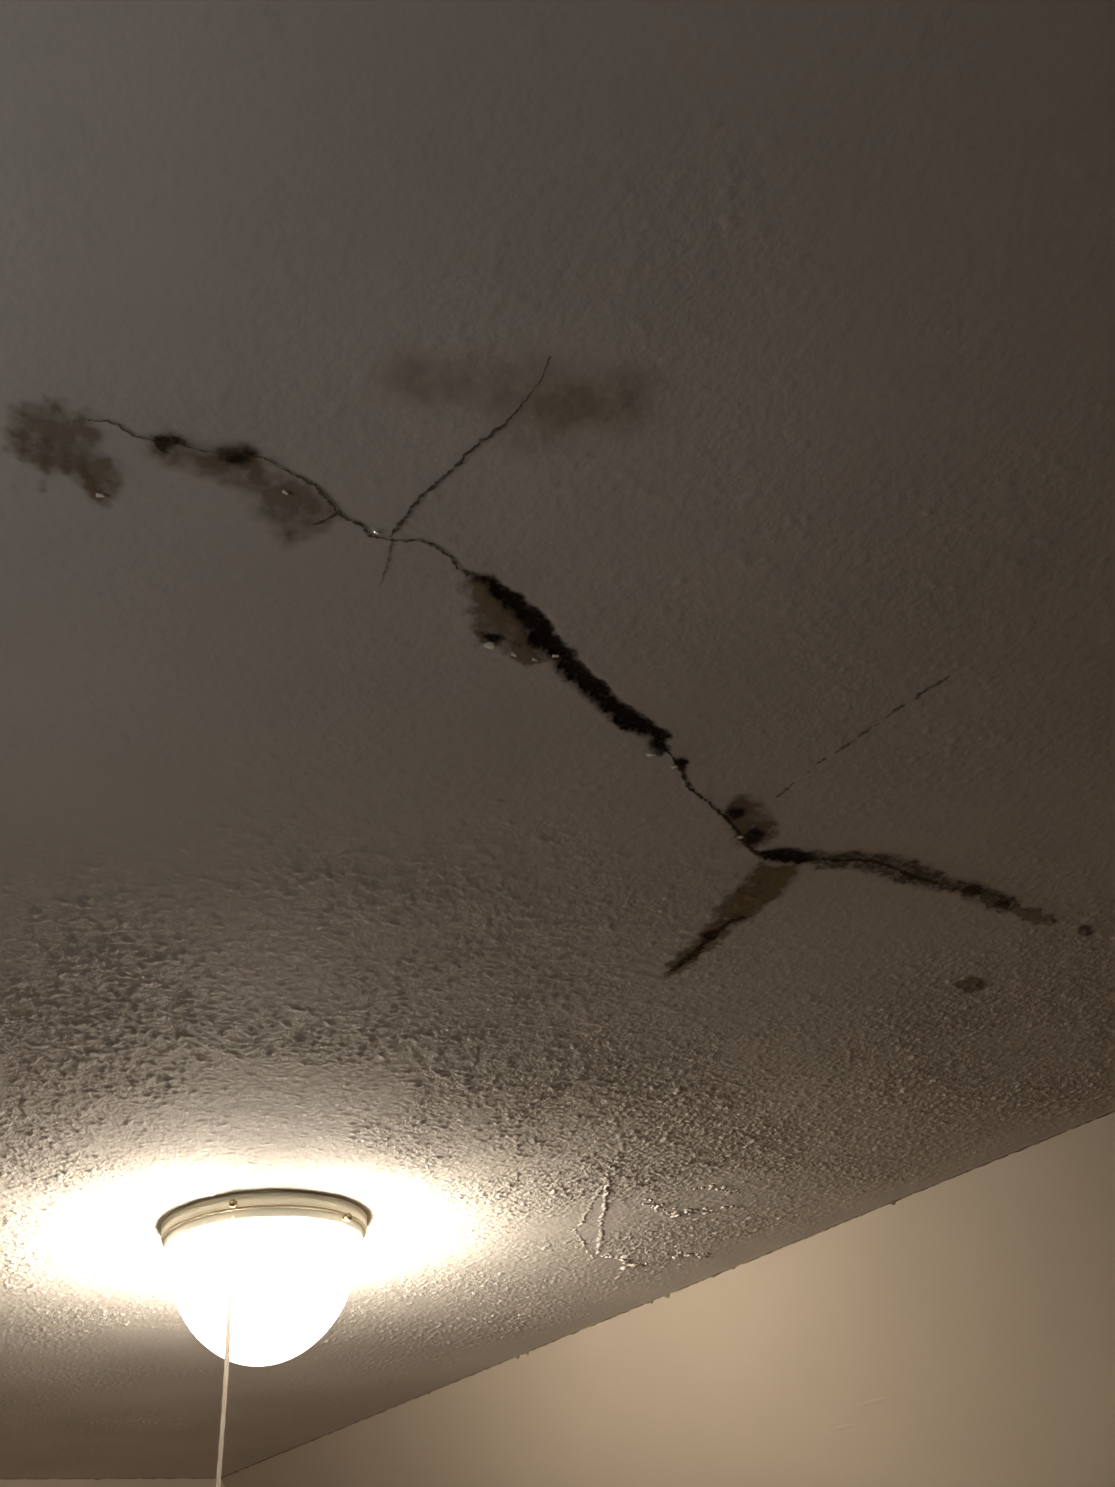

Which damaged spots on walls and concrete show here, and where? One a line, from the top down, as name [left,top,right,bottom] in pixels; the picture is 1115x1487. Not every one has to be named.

leakage [9,404,119,499]
leakage [154,446,331,539]
crack [88,356,1093,935]
crack [664,916,747,978]